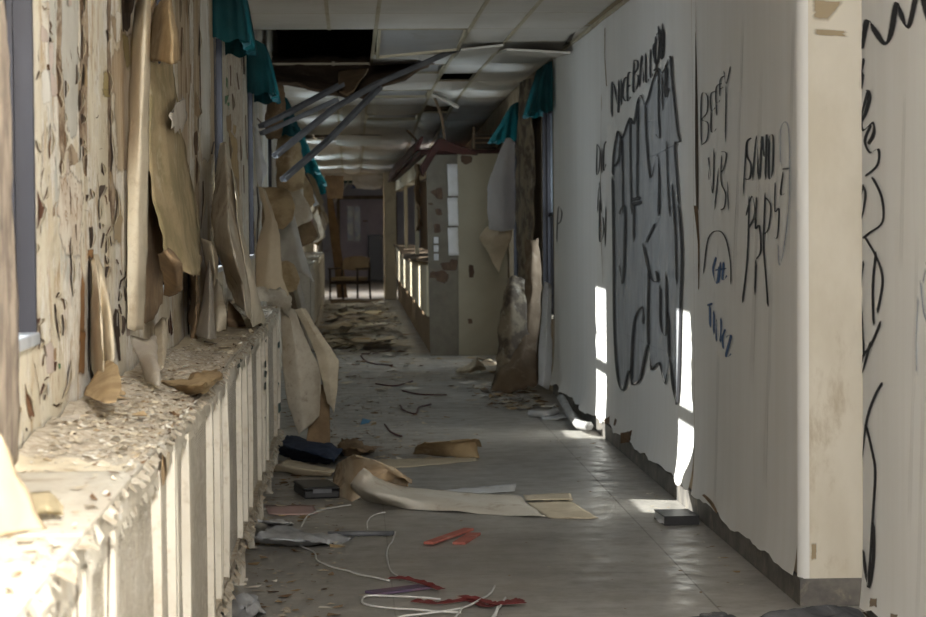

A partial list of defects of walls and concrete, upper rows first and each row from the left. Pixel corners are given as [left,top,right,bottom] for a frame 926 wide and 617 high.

flaking render [41,0,135,361]
flaking render [175,0,216,212]
flaking render [226,54,246,240]
peeling [429,259,458,283]